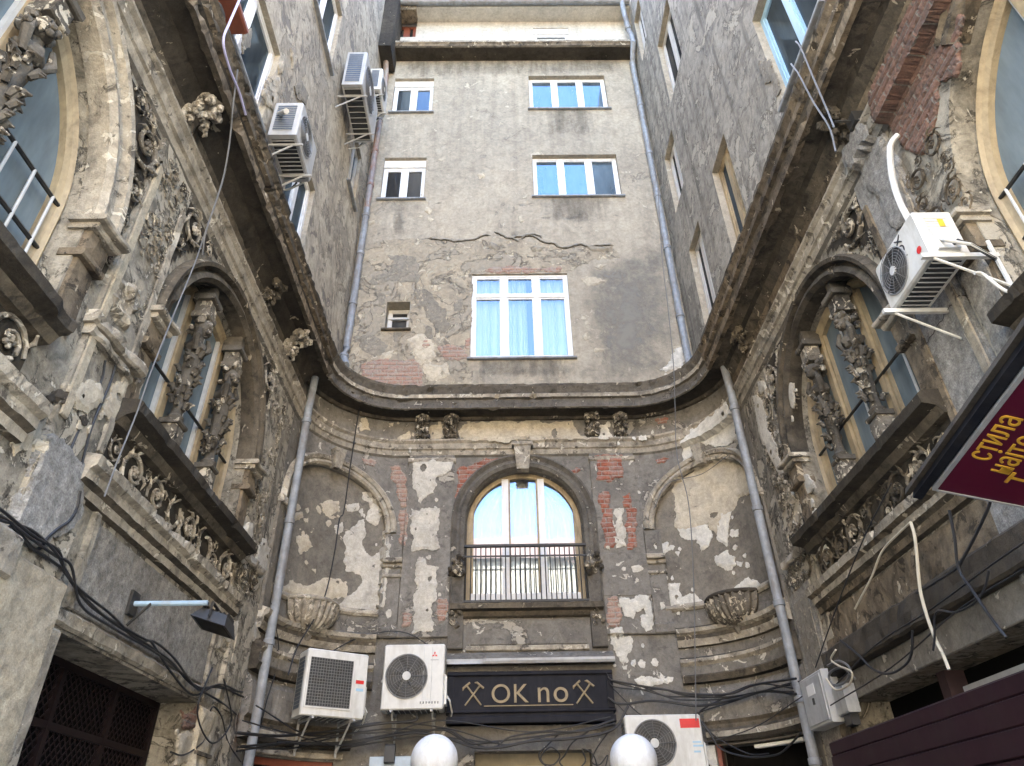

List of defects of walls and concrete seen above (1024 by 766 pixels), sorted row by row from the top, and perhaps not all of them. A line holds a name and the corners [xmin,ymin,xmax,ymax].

flaking render [842,0,966,229]
peeling [348,236,620,386]
crack [428,231,614,249]
peeling [359,417,371,432]
peeling [241,420,638,642]
flaking render [632,417,668,441]
peeling [653,401,760,588]
peeling [606,565,702,689]